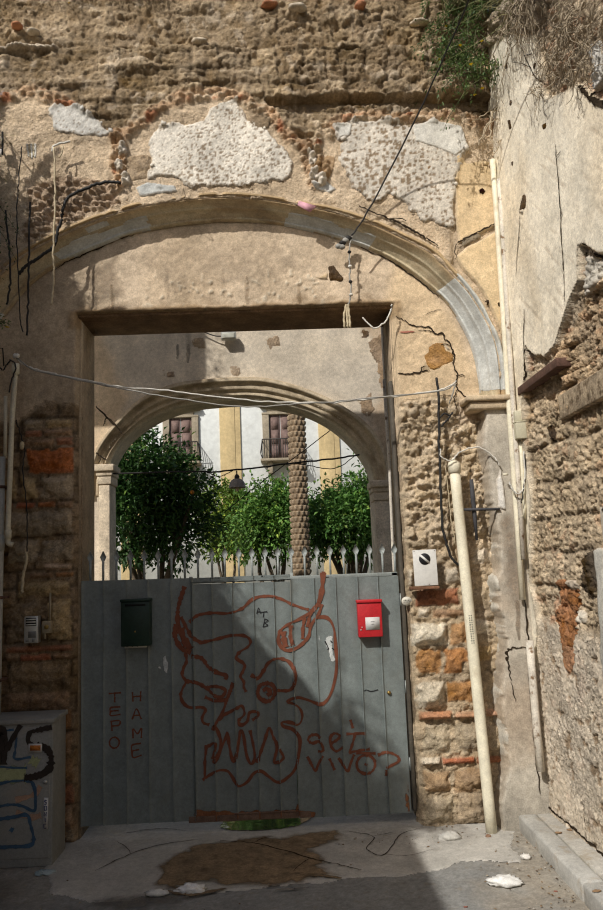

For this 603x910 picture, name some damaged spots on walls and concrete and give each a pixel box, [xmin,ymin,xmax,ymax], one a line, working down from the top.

crack [578,85,603,108]
flaking render [48,96,293,197]
peeling [54,216,151,259]
flaking render [307,115,505,393]
crack [359,205,494,258]
flaking render [583,254,603,297]
crack [361,247,466,407]
spalling [547,425,557,442]
flaking render [555,550,597,647]
flaking render [491,671,509,756]
crack [505,600,603,856]